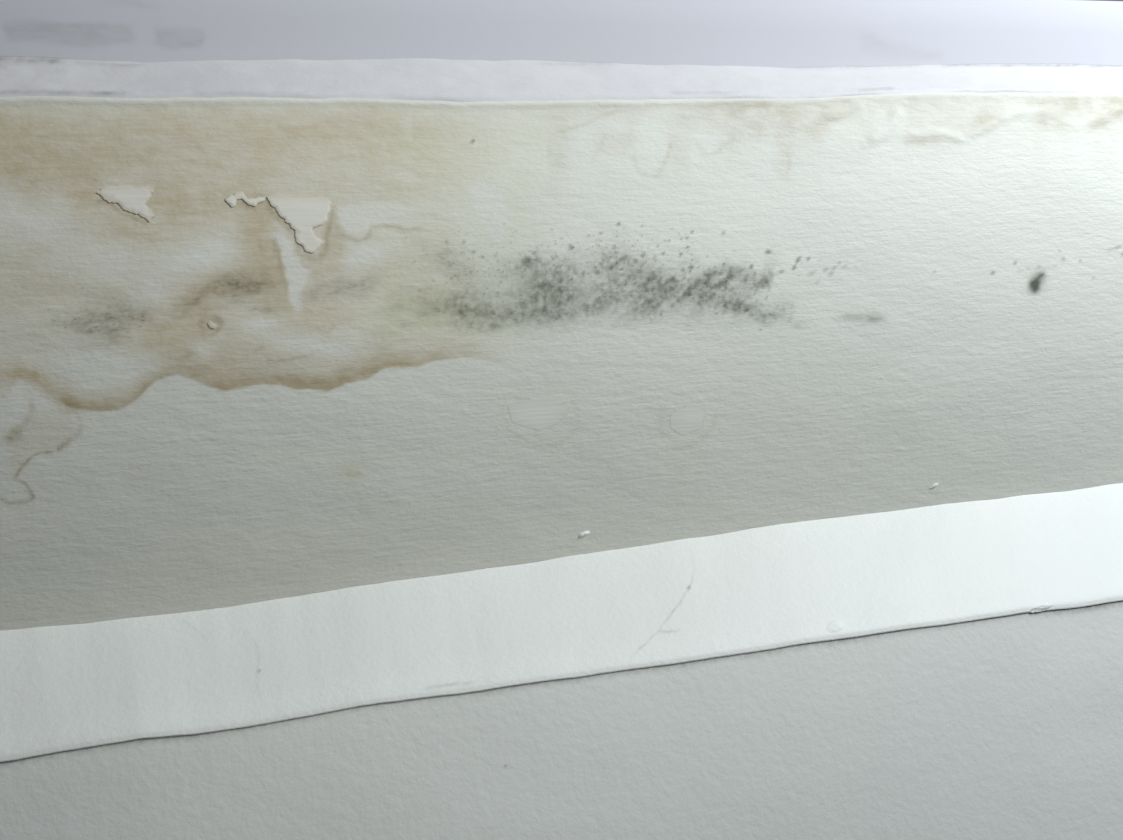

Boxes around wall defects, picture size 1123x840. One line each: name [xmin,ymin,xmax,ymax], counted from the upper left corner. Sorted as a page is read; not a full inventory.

peeling [96,184,156,222]
peeling [225,191,331,253]